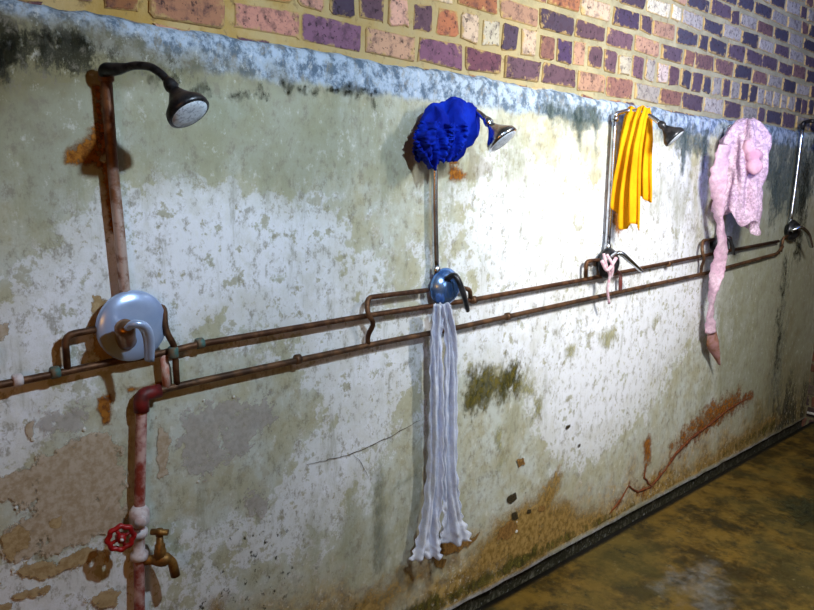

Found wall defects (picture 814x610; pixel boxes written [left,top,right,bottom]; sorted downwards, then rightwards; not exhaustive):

corrosion [64,84,114,233]
corrosion [98,394,112,425]
water stain [465,392,477,422]
corrosion [657,388,753,478]
peeling [0,399,131,610]
water stain [477,471,605,575]